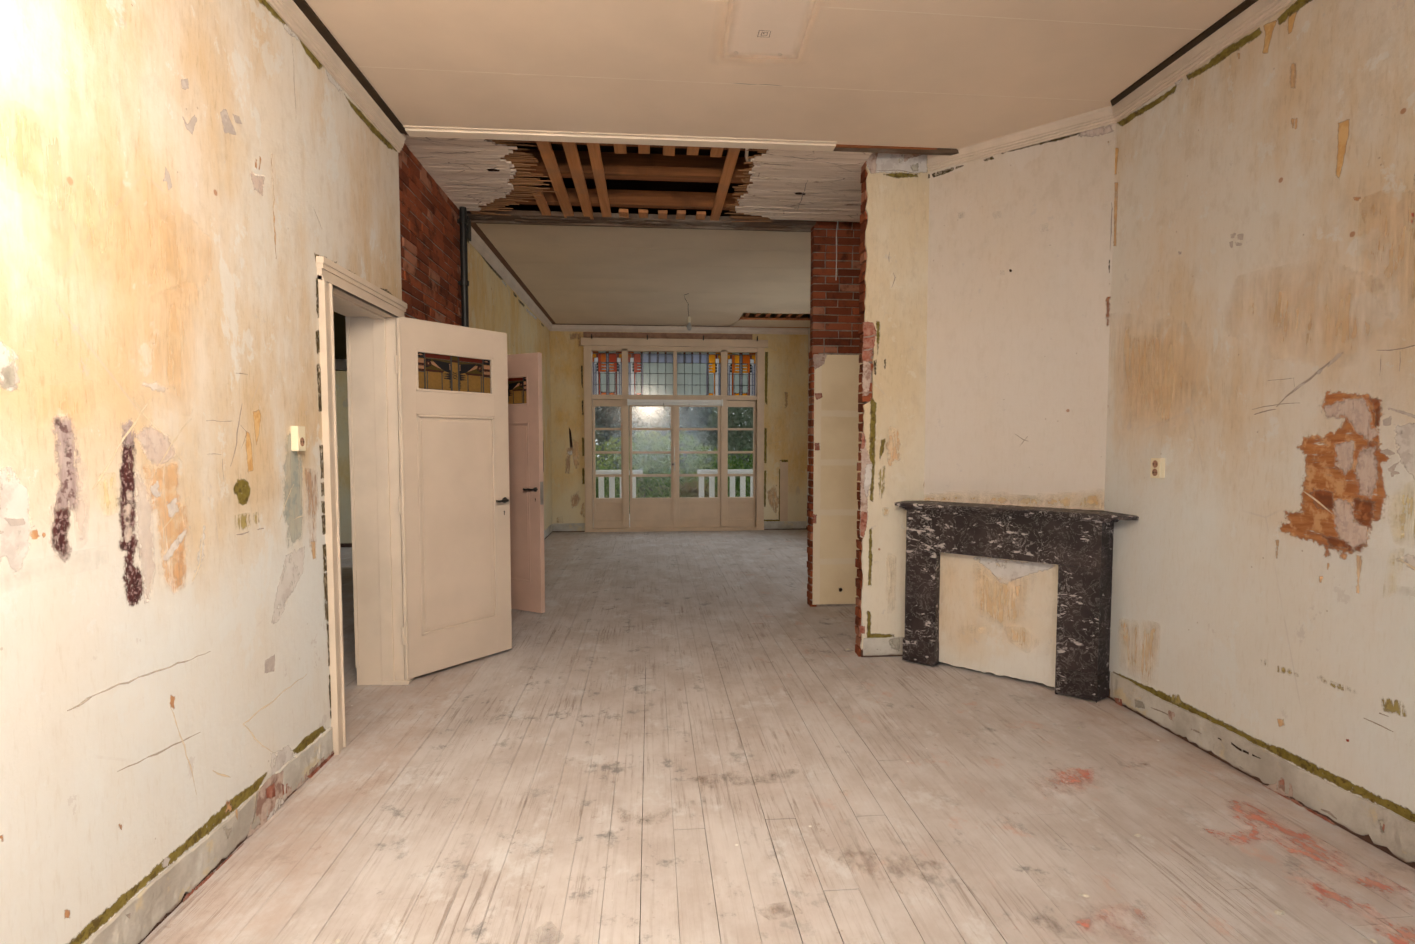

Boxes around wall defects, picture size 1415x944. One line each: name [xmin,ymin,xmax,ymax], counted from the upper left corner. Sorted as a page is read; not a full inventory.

peeling [0,342,20,391]
spalling [862,322,876,396]
damp [210,406,261,477]
peeling [1380,408,1415,479]
peeling [0,467,31,571]
peeling [124,492,132,542]
peeling [271,548,305,624]
crack [68,652,208,711]
peeling [265,655,275,673]
damp [1364,699,1406,732]
crack [117,709,200,795]